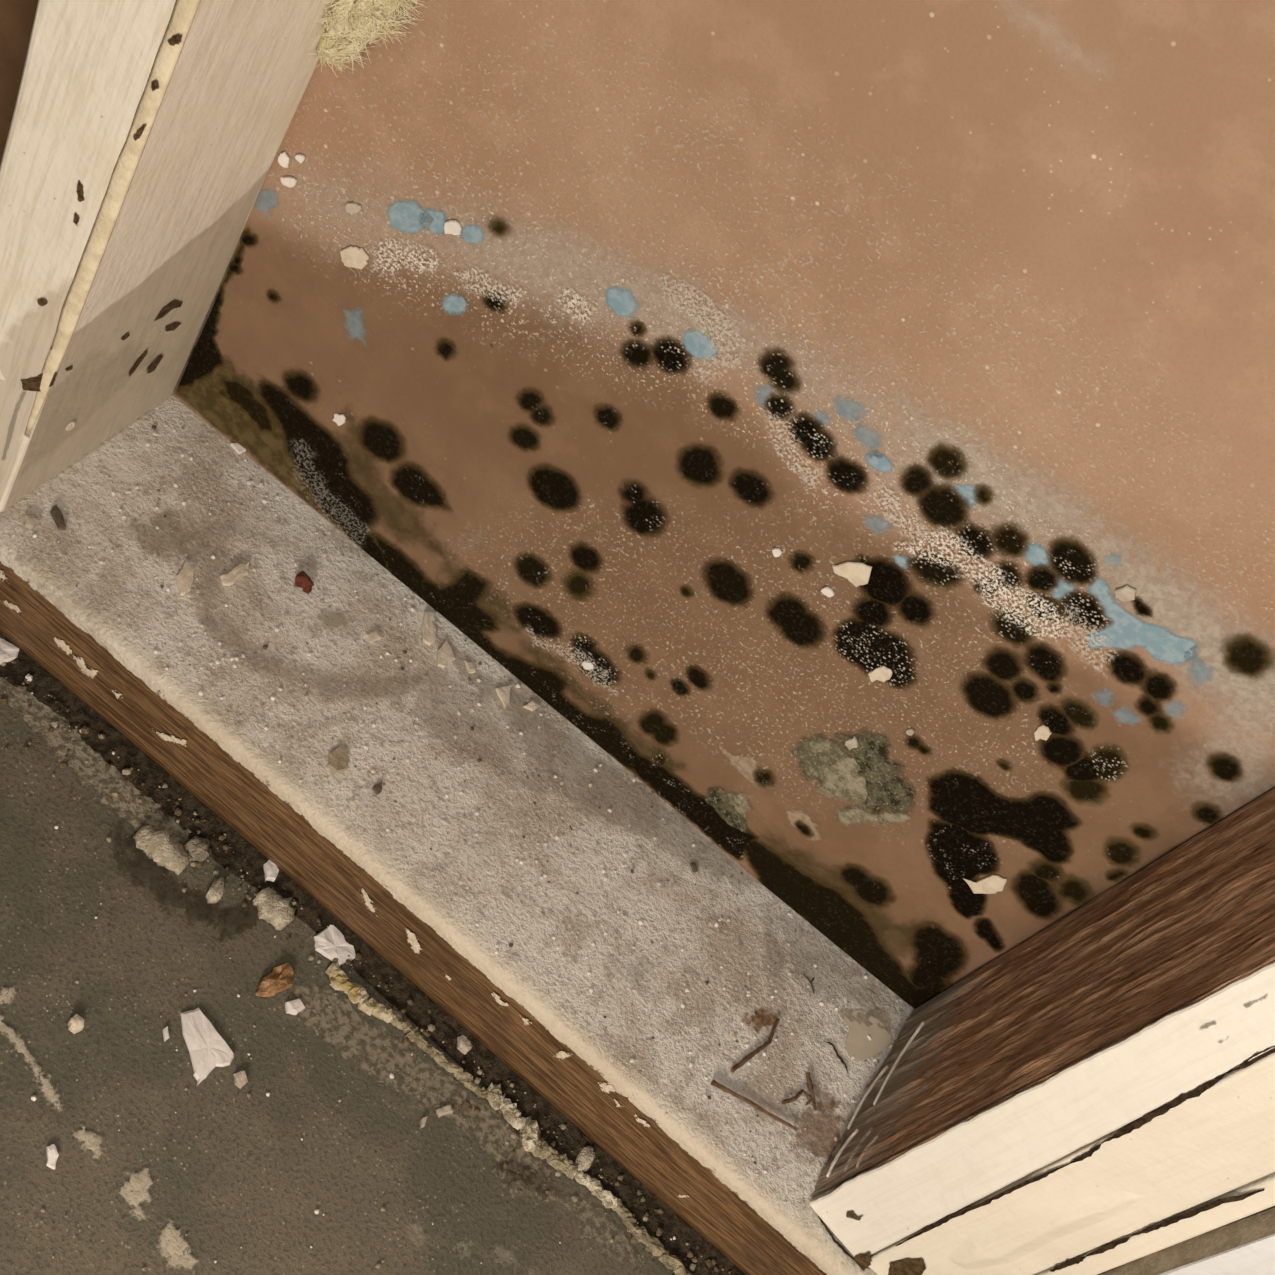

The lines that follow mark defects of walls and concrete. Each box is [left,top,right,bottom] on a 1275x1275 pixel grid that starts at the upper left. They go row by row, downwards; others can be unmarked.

damp [274,152,1275,804]
damp [173,229,968,1009]
peeling [1115,585,1136,601]
peeling [845,736,858,750]
damp [1192,803,1221,825]
damp [1105,825,1157,882]
damp [1011,859,1093,920]
damp [973,918,1005,952]
crack [823,1041,848,1072]
crack [896,1046,1275,1246]
crack [818,1215,869,1269]
crack [1050,1188,1265,1272]